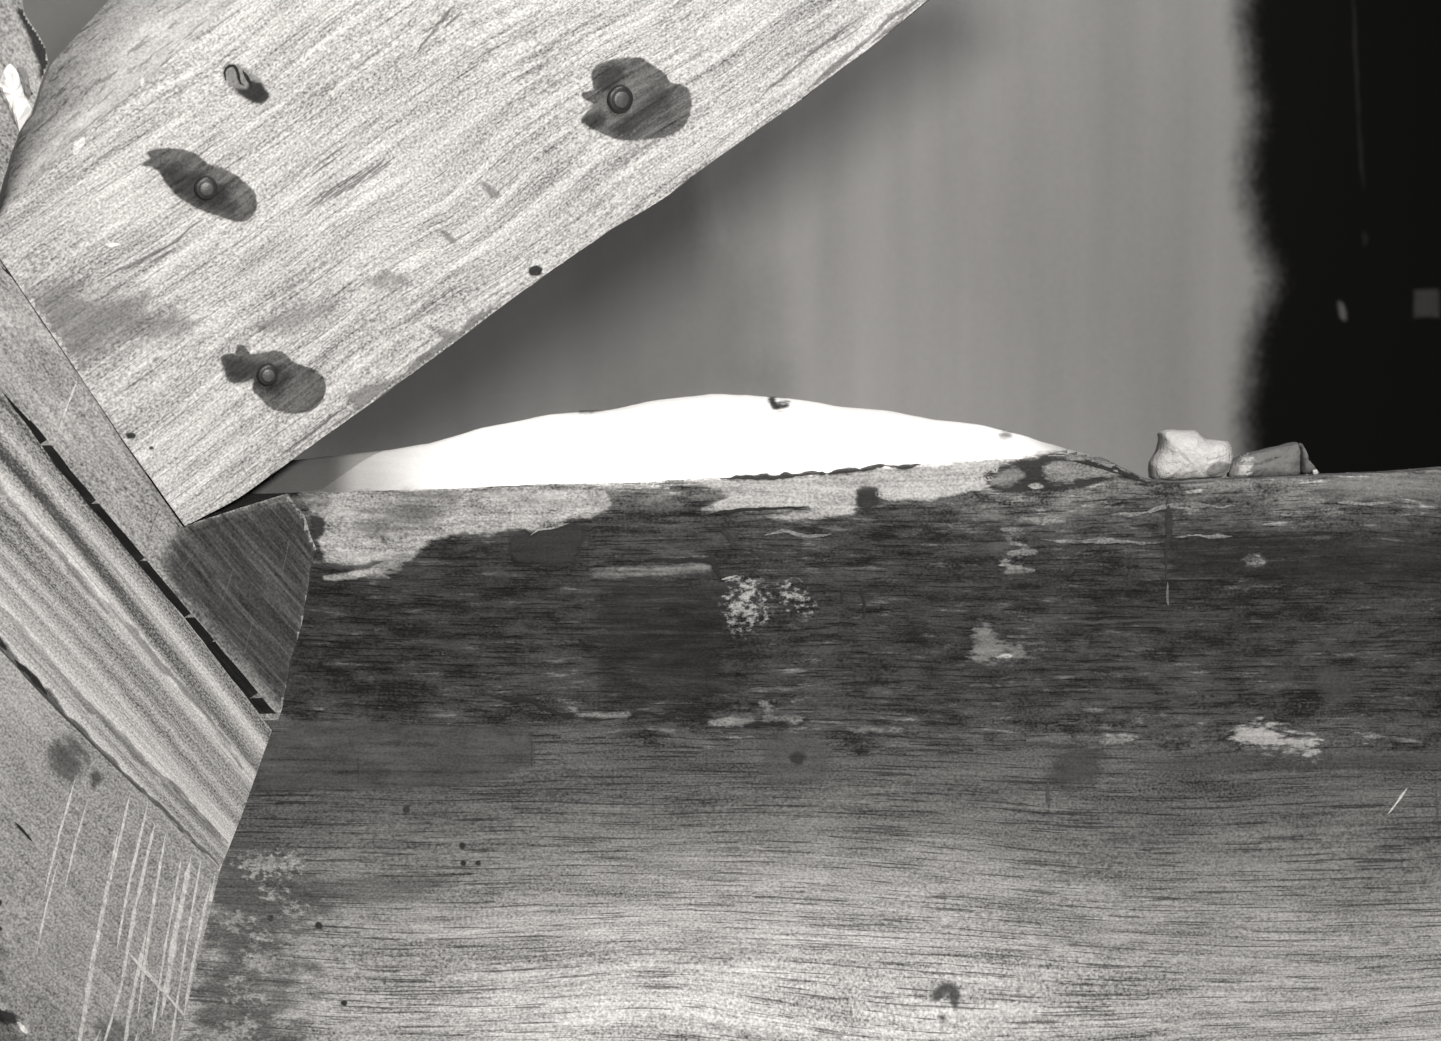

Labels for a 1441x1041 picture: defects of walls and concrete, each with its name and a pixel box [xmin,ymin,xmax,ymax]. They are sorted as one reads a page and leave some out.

peeling [970,623,1026,666]
peeling [1229,717,1324,757]